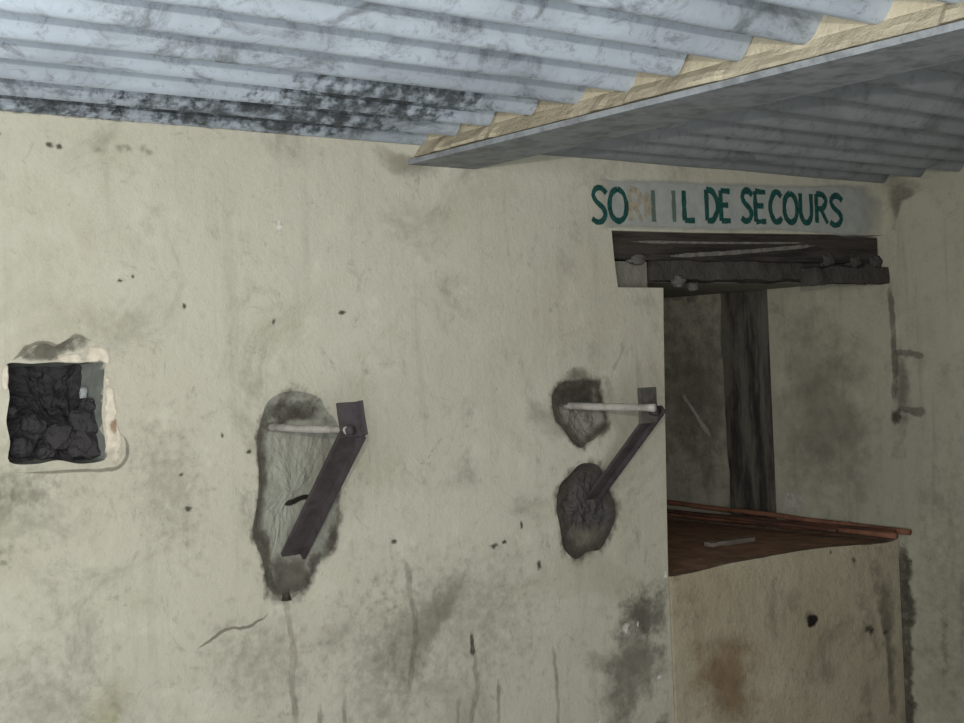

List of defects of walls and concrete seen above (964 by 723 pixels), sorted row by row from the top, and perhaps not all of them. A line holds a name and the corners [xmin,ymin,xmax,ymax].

damp [0,93,123,120]
damp [136,74,481,136]
spalling [59,347,122,463]
spalling [552,372,610,449]
spalling [247,391,342,599]
spalling [556,463,617,559]